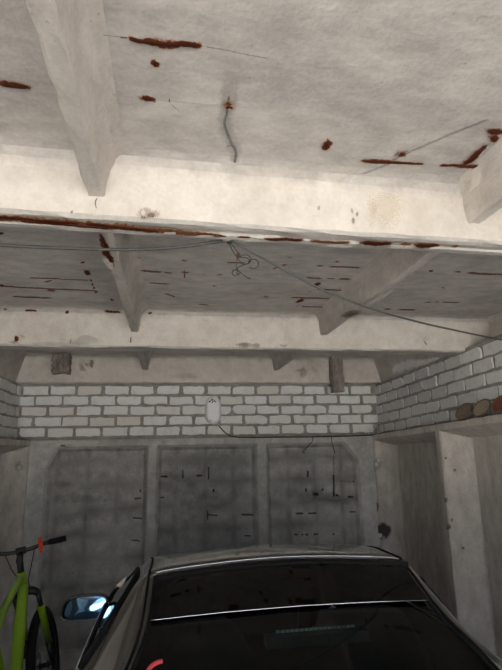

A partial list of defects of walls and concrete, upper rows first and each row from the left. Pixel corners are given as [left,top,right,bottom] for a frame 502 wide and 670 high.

rust [120,36,202,49]
rust [0,80,31,90]
rust [220,99,237,111]
rust [361,150,424,165]
rust [439,128,502,169]
rust [0,215,440,249]
rust [0,261,98,299]
rust [290,277,351,308]